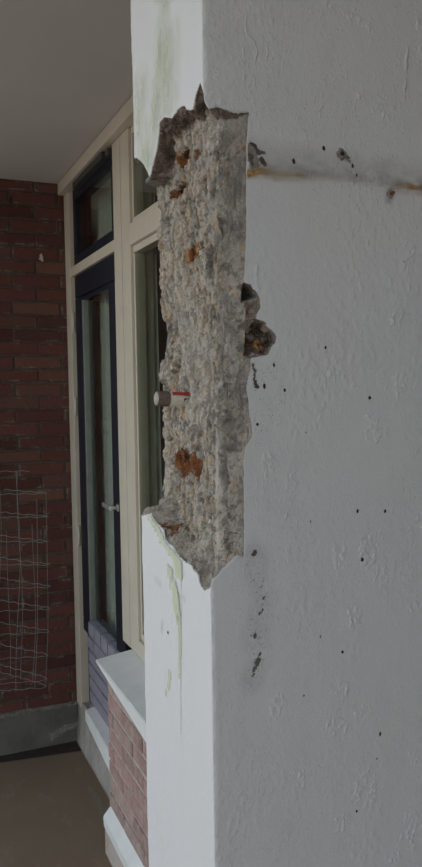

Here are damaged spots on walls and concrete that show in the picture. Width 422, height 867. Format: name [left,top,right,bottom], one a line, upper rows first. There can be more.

rust [176,148,201,169]
rust [169,181,188,199]
spalling [135,83,276,696]
rust [169,446,205,483]